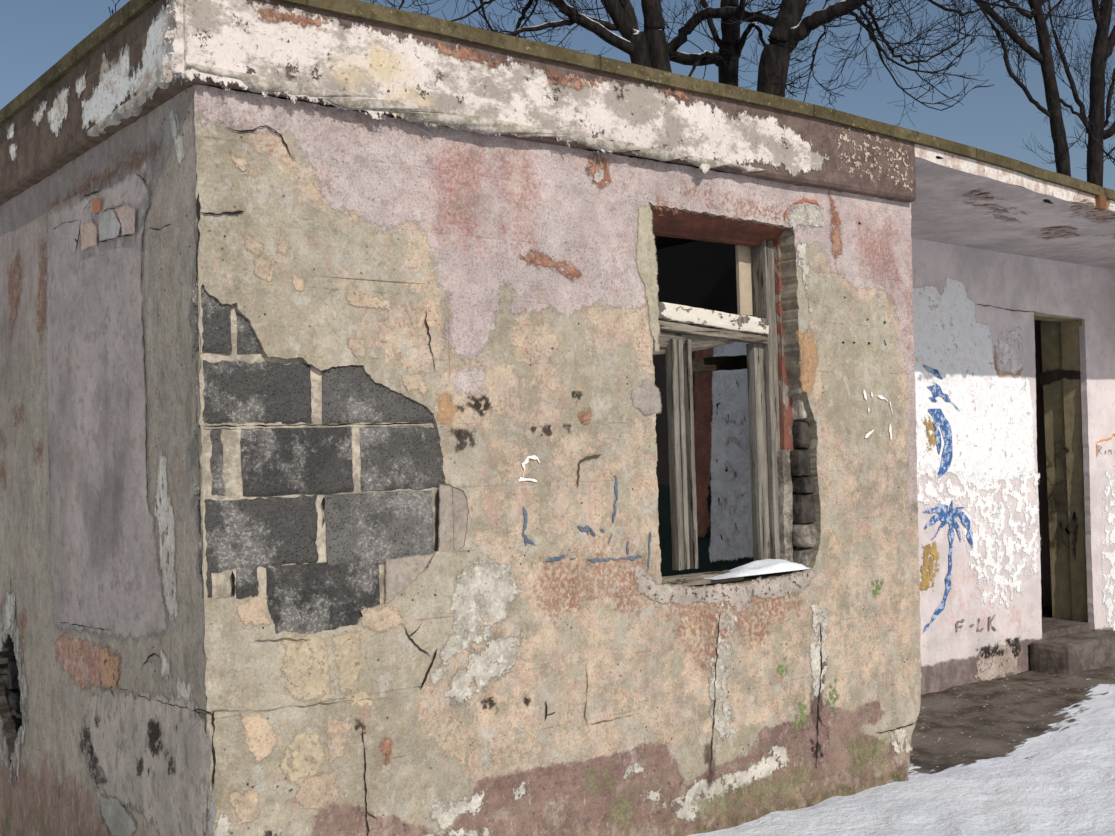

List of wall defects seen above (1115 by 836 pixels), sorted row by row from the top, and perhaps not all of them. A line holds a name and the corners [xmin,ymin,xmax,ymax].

peeling [6,122,17,162]
peeling [33,67,87,137]
peeling [1035,199,1115,239]
spalling [192,278,468,809]
peeling [430,558,525,709]
spalling [0,592,29,786]
crack [120,689,391,790]
crack [362,730,377,836]
peeling [623,745,792,823]
water stain [705,745,715,785]
crack [711,617,720,761]
crack [816,623,829,768]